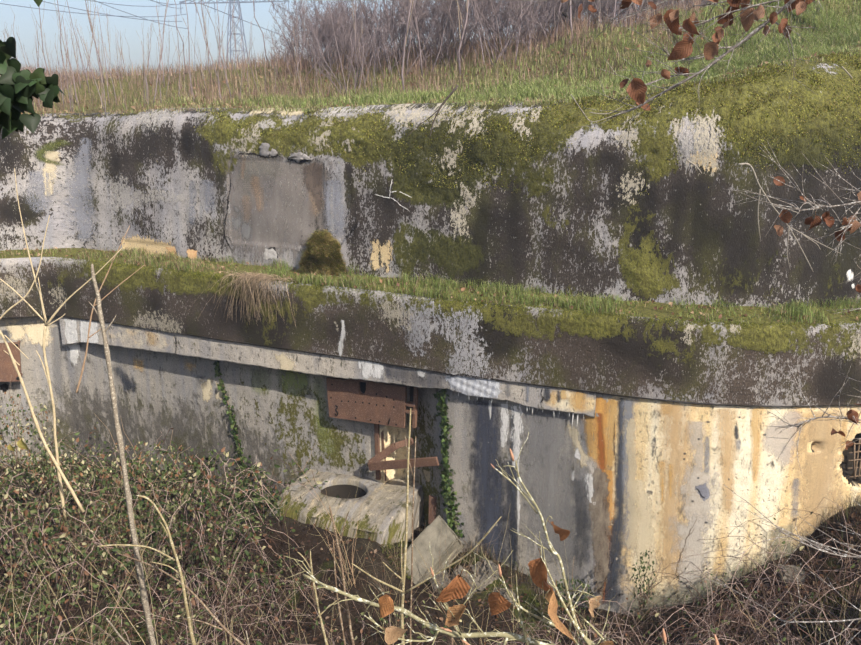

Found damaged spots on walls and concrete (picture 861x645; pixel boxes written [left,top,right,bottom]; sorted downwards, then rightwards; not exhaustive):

peeling [509,105,541,141]
leakage [29,140,68,210]
leakage [69,138,92,240]
spalling [219,102,487,262]
rust [561,390,618,565]